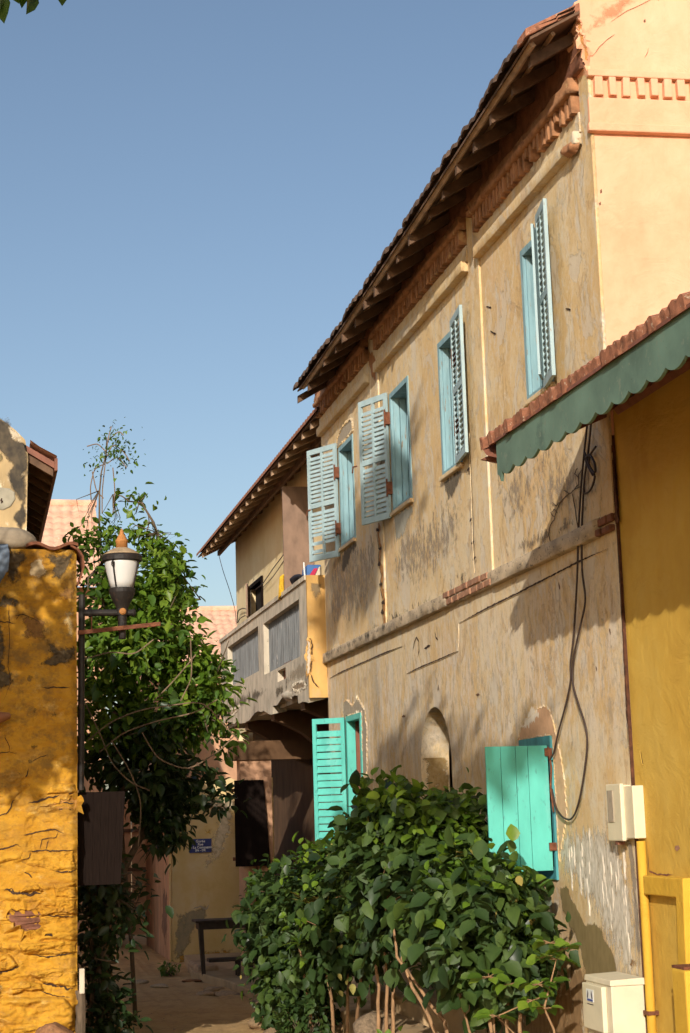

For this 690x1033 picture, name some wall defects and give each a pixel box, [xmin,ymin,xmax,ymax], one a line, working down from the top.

crack [586,0,649,57]
crack [309,433,629,752]
spalling [0,900,50,942]
crack [0,793,75,974]
crack [42,983,72,997]
damp [487,886,616,1033]
peeling [517,704,638,975]
damp [629,843,640,966]